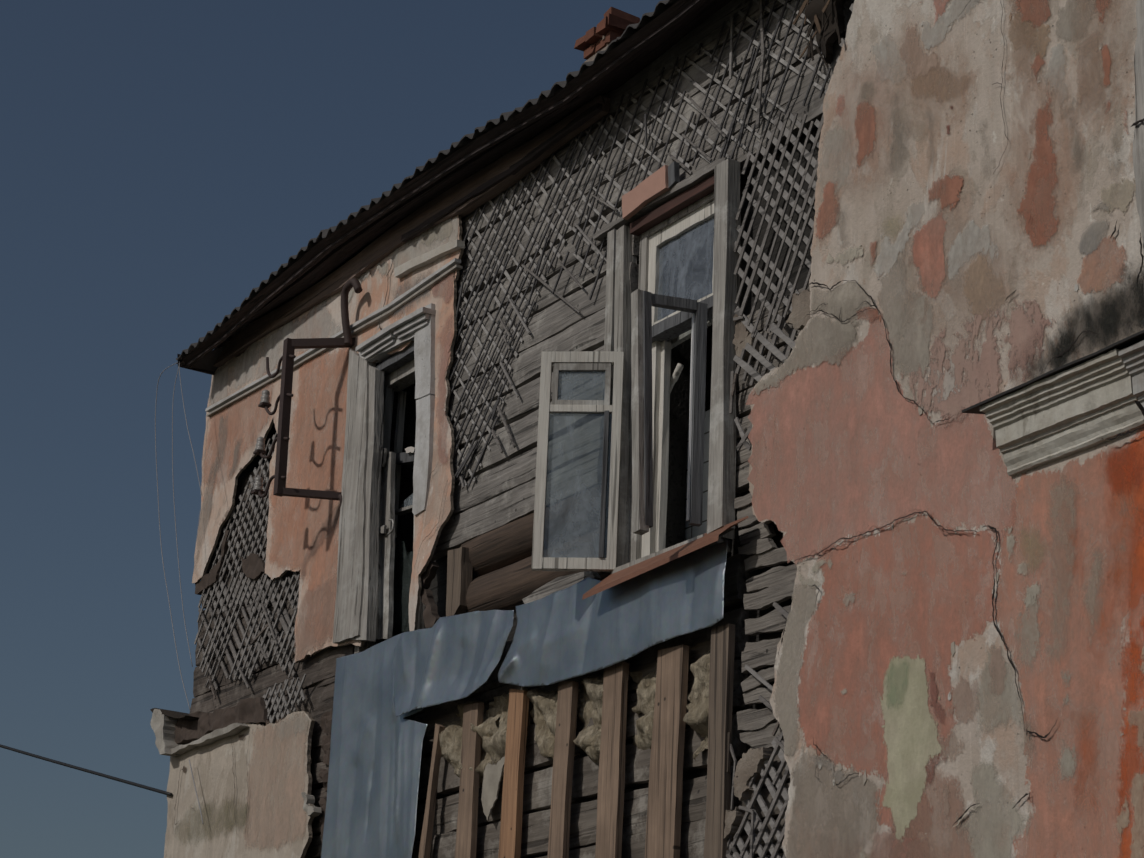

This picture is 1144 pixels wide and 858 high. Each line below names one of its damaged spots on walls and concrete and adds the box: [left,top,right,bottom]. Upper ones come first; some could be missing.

spalling [1009,0,1111,86]
peeling [348,215,459,303]
peeling [431,275,454,463]
crack [807,280,954,424]
peeling [869,175,964,299]
peeling [1017,92,1059,247]
water stain [1035,274,1144,375]
peeling [1074,176,1136,294]
peeling [270,348,348,643]
peeling [746,300,1053,858]
crack [793,509,1057,738]
rust [1109,430,1144,858]